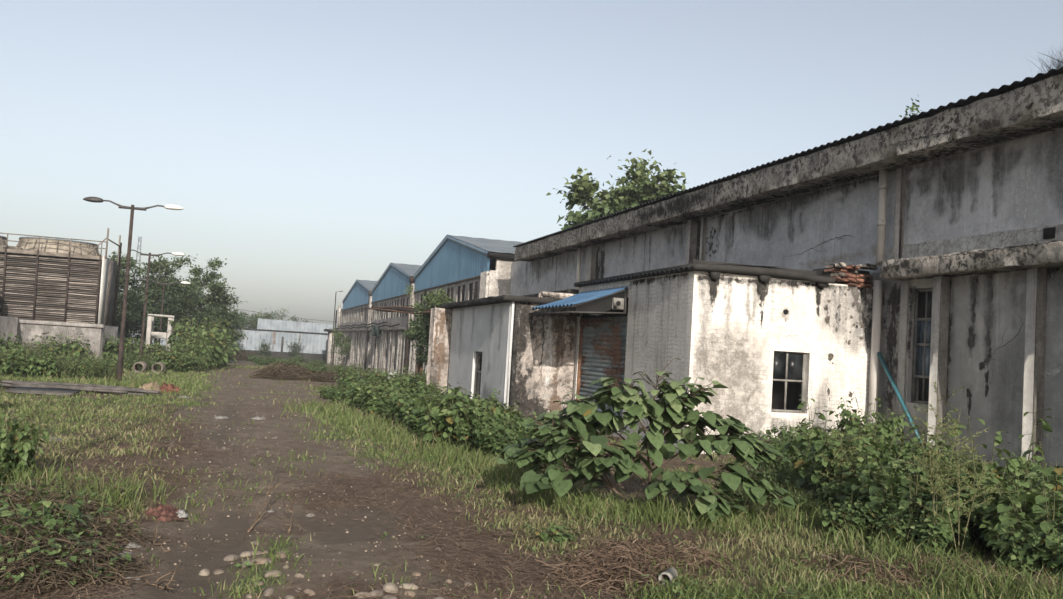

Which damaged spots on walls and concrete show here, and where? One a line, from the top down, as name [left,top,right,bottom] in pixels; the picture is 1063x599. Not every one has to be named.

damp [522,102,1063,283]
damp [510,302,576,423]
damp [633,260,1059,410]